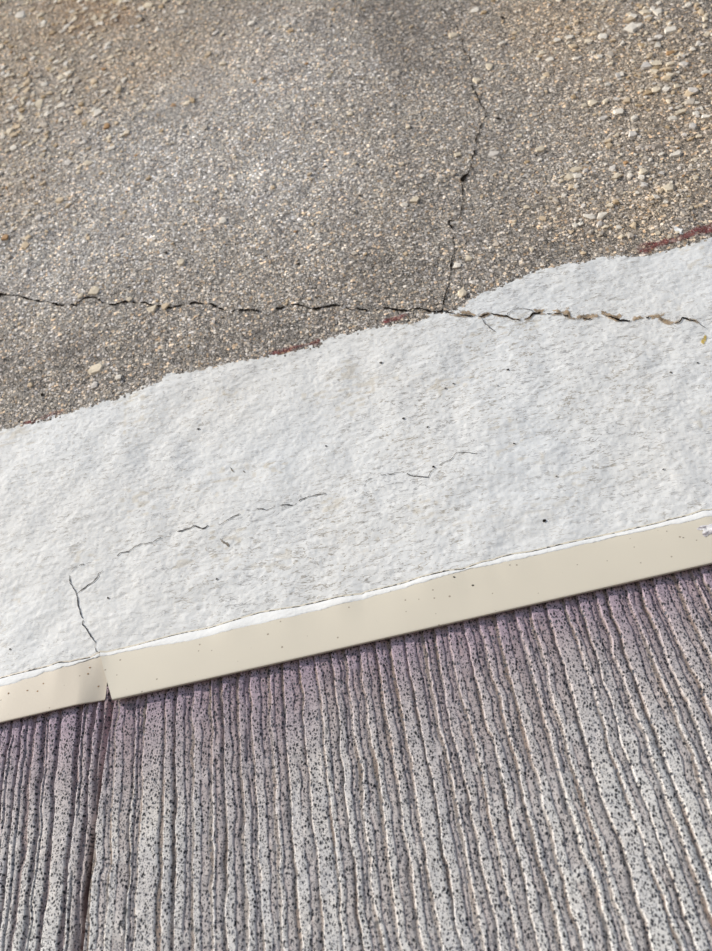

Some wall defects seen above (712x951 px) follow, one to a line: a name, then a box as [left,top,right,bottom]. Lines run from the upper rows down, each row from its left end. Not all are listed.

crack [0,0,712,331]
crack [365,452,471,482]
crack [0,493,709,679]